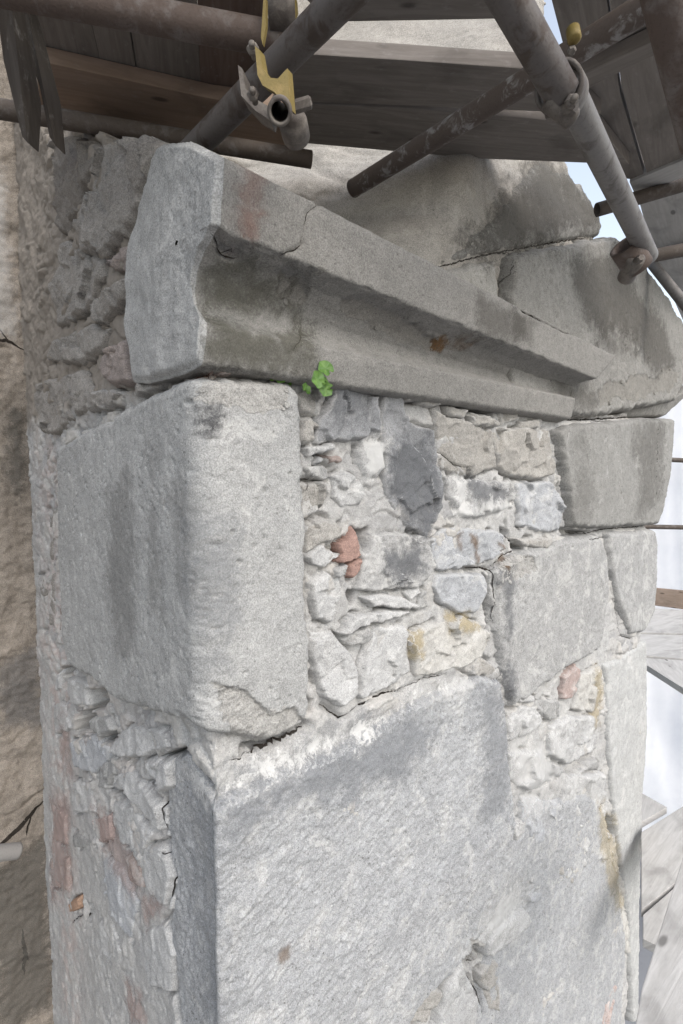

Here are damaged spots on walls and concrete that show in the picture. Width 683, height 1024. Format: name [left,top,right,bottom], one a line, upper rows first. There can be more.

leakage [456,161,600,268]
crack [439,236,593,332]
corrosion [430,334,449,353]
crack [464,529,512,621]
crack [232,726,302,760]
crack [162,801,178,897]